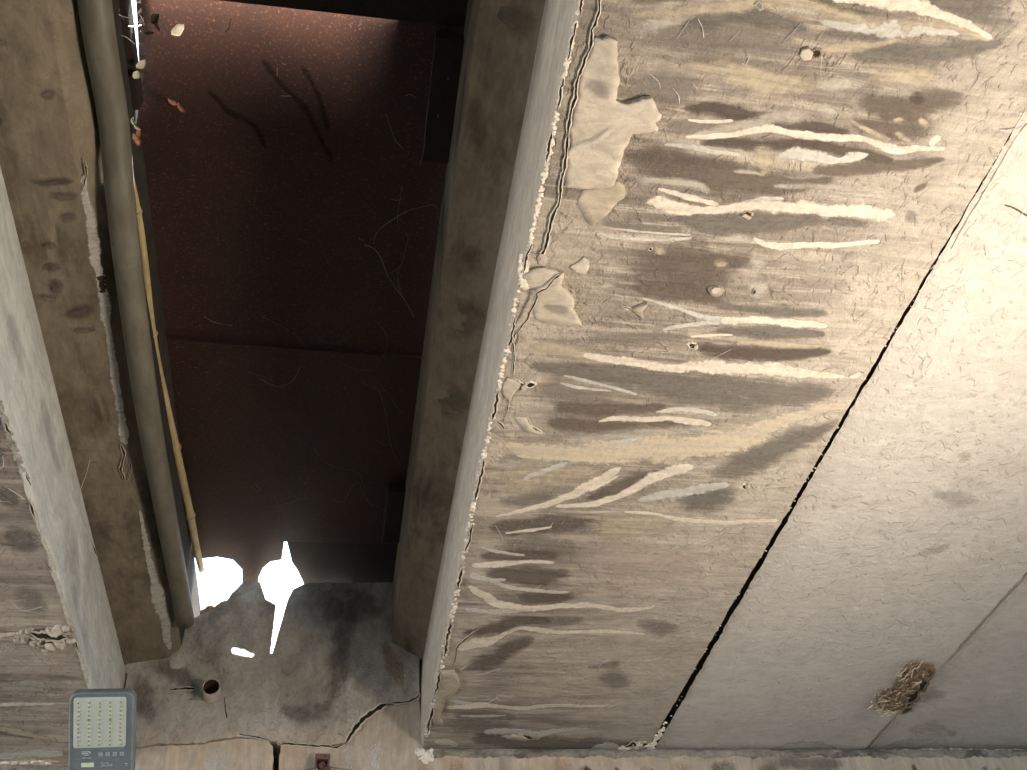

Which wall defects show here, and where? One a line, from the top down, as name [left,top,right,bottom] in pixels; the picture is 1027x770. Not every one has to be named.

crack [536,0,601,261]
crack [511,331,519,377]
peeling [424,0,662,750]
damp [456,0,1004,677]
damp [5,529,36,552]
damp [0,681,55,706]
crack [169,686,421,749]
damp [446,699,629,749]